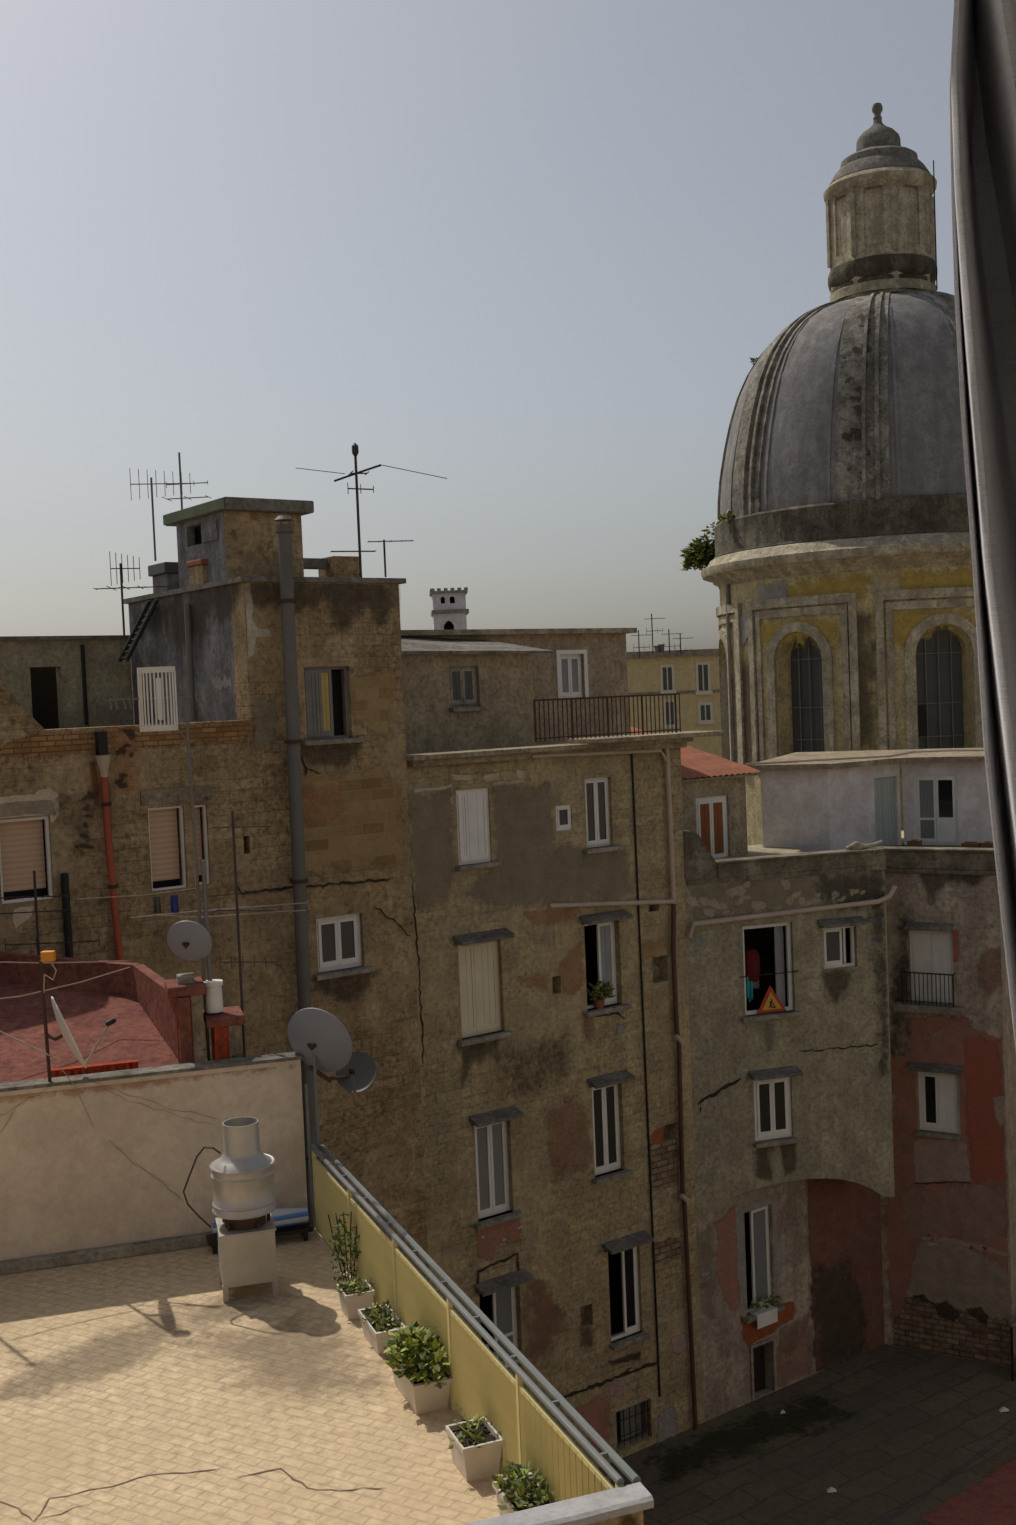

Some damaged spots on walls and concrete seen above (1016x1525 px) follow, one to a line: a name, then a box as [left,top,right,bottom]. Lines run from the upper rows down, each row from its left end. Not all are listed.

crack [697,1078,741,1113]
peeling [715,1015,1009,1372]
crack [0,1468,381,1522]
leakage [620,1515,636,1525]